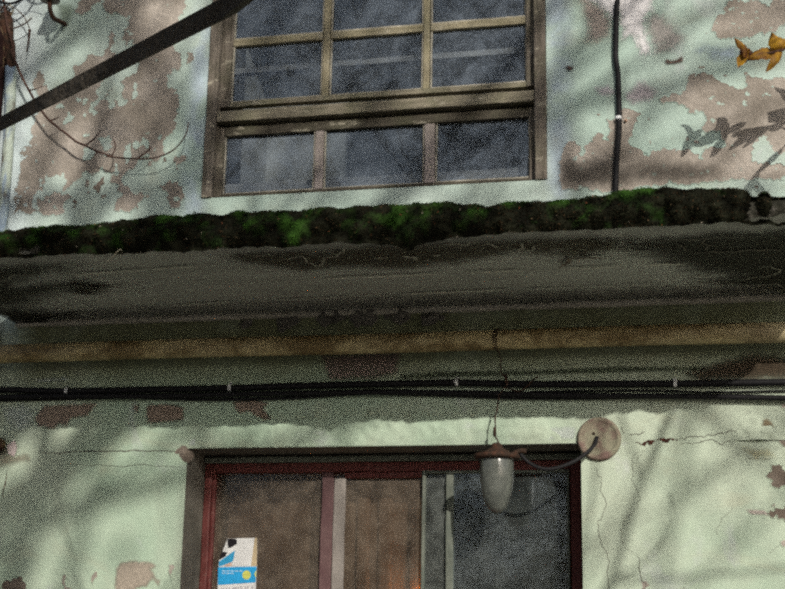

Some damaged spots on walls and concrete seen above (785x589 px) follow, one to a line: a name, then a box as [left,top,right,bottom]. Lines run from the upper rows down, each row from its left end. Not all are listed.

peeling [72,0,188,77]
leakage [583,0,608,39]
peeling [706,0,785,40]
peeling [12,44,195,217]
peeling [558,66,785,194]
leakage [233,231,785,290]
leakage [0,265,192,323]
crack [39,445,176,467]
peeling [765,463,785,489]
crack [594,427,732,589]
peeling [765,502,785,522]
peeling [115,561,160,589]